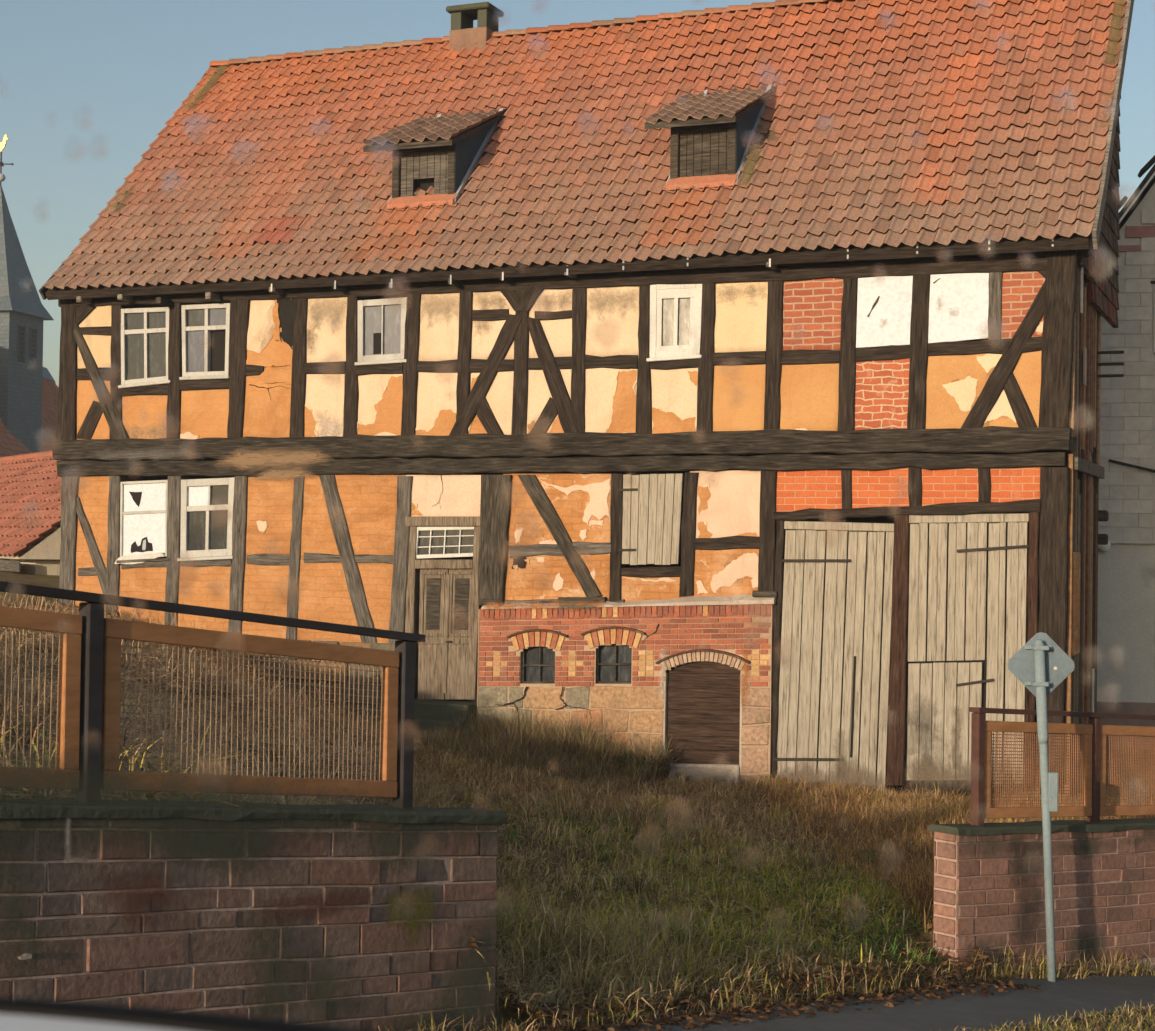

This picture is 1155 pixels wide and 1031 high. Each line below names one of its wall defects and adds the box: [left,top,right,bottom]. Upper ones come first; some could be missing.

spalling [277,299,295,349]
flaking render [304,405,318,437]
flaking render [357,376,403,436]
flaking render [415,409,456,436]
flaking render [468,416,487,434]
flaking render [605,369,637,433]
flaking render [652,406,697,434]
flaking render [942,353,1002,412]
flaking render [984,390,1017,425]
flaking render [539,478,611,541]
spalling [511,527,557,571]
flaking render [695,553,759,595]